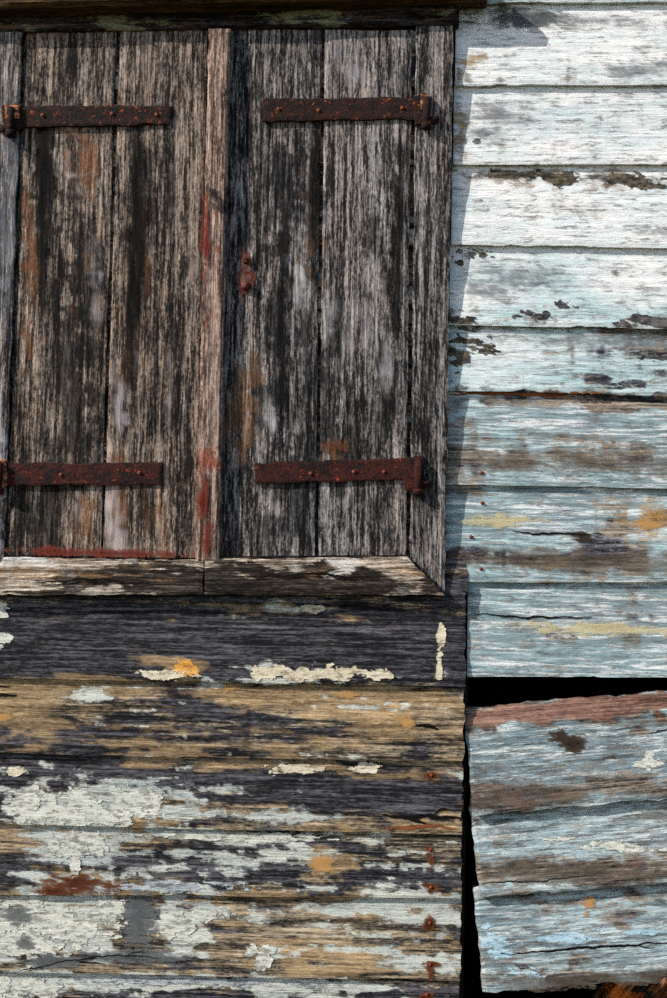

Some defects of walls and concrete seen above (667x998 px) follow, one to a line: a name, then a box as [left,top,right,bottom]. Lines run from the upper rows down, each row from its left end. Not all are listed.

corrosion [5,104,20,119]
peeling [487,168,581,189]
peeling [597,171,667,191]
corrosion [4,473,213,558]
peeling [134,659,202,681]
peeling [250,662,394,683]
peeling [261,759,325,776]
peeling [1,766,163,889]
peeling [159,830,370,844]
corrosion [35,871,122,896]
peeling [0,880,278,998]
crack [501,942,667,955]